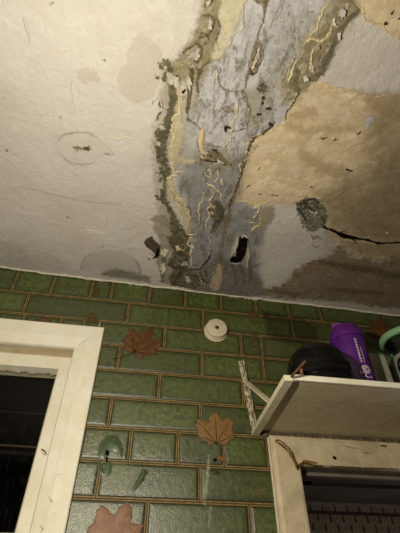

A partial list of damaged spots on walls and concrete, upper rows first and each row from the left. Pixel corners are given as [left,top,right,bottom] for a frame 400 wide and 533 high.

hole [144,236,168,283]
leakage [151,0,400,309]
peeling [175,0,400,302]
crack [323,226,400,246]